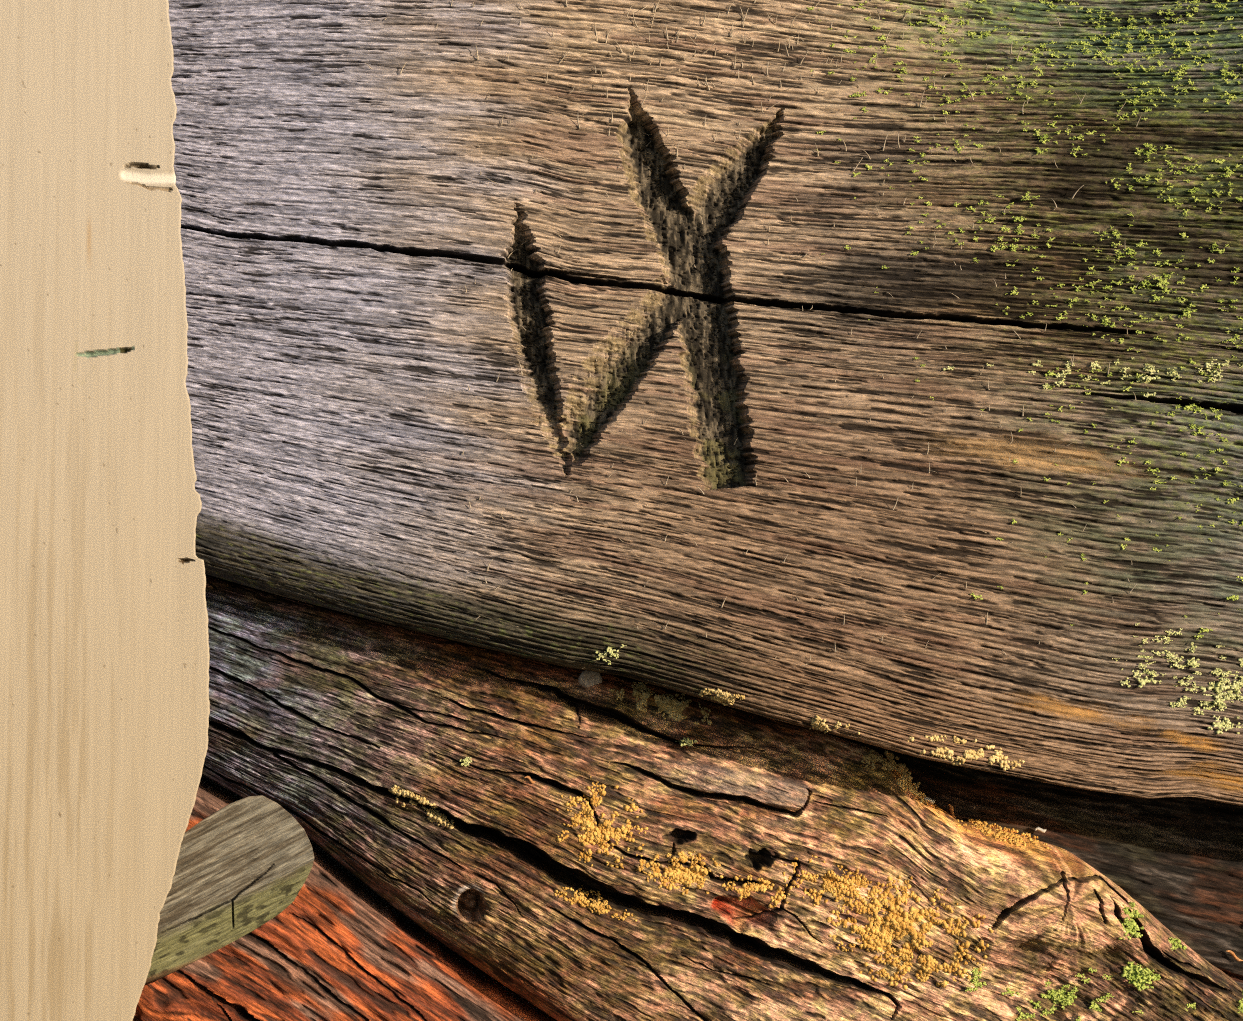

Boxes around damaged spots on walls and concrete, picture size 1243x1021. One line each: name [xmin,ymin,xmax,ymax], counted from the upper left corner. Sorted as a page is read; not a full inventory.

crack [181,224,1157,335]
crack [1080,391,1243,414]
crack [1193,342,1243,353]
crack [203,626,902,1021]
crack [157,863,369,1021]
crack [991,870,1243,995]